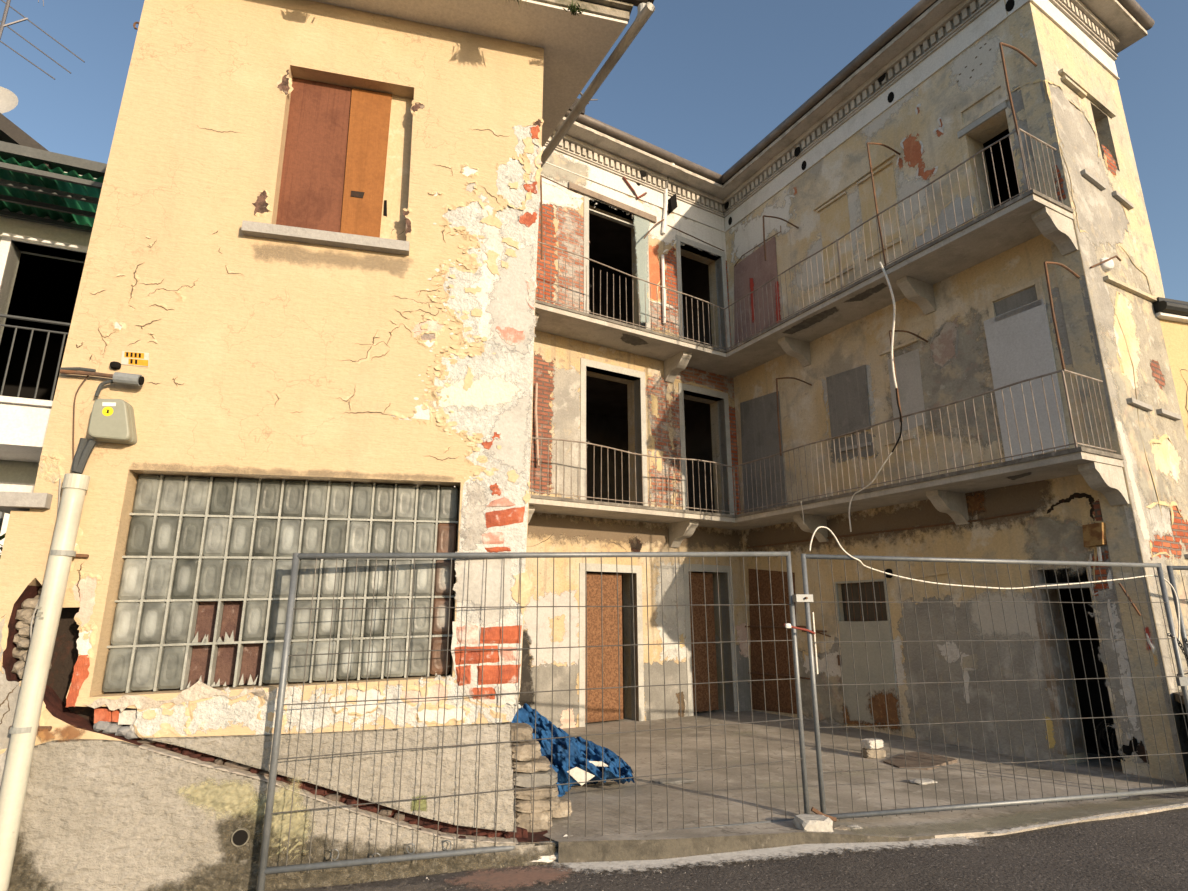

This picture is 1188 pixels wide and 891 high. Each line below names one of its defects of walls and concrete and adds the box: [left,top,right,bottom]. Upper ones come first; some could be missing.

flaking render [896,117,944,180]
crack [76,236,199,361]
crack [213,231,243,275]
crack [335,226,470,415]
flaking render [39,452,65,484]
flaking render [66,118,591,739]
flaking render [645,367,741,515]
crack [1047,493,1095,523]
flaking render [1006,79,1188,782]